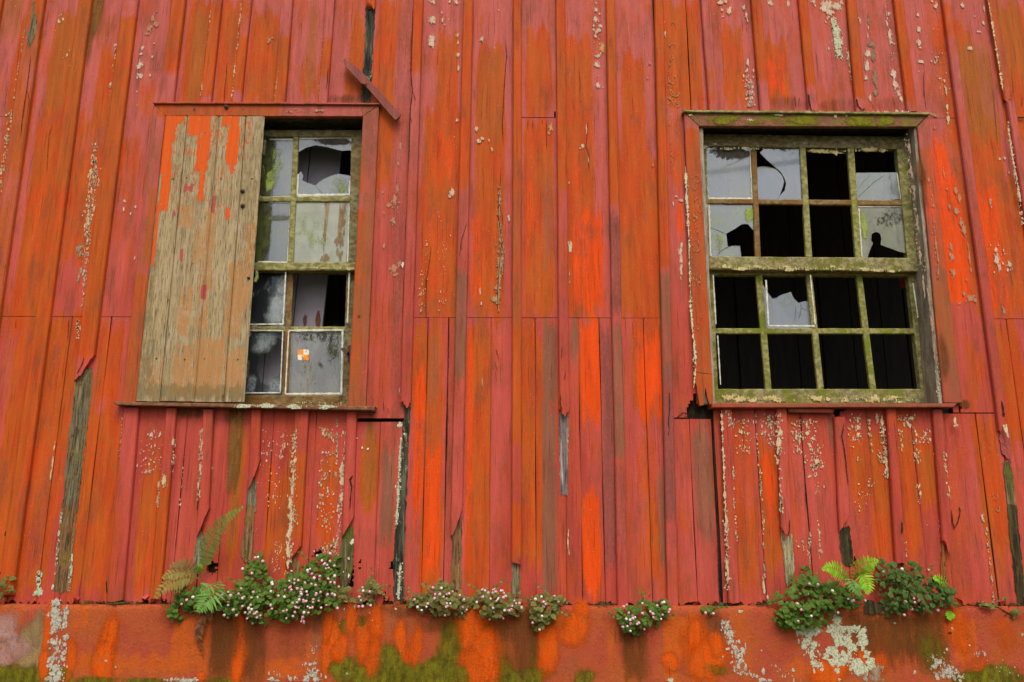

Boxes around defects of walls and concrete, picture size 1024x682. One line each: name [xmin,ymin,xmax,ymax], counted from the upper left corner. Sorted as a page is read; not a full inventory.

peeling [811,0,843,19]
peeling [846,6,950,129]
peeling [76,143,101,306]
crack [496,176,504,298]
peeling [673,167,697,388]
peeling [990,244,1013,273]
peeling [136,430,184,507]
peeling [197,428,213,500]
peeling [260,429,298,574]
peeling [314,419,346,555]
peeling [720,394,951,590]
peeling [999,424,1012,459]